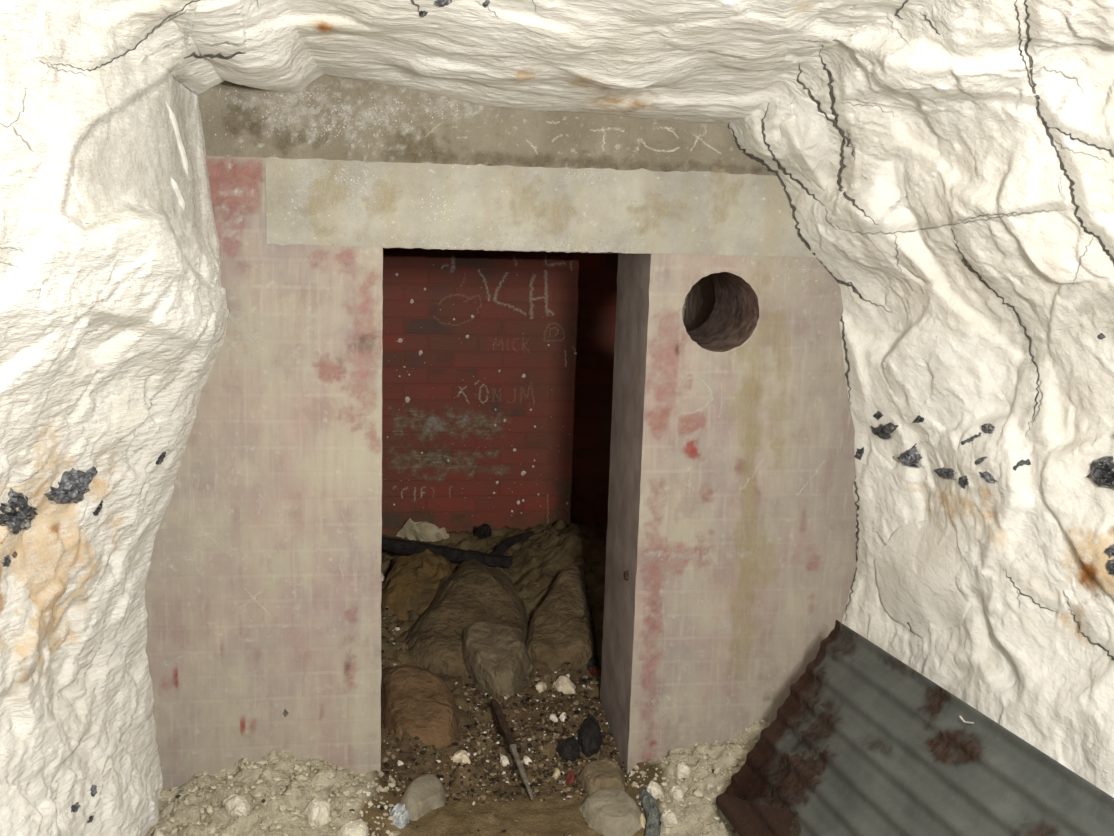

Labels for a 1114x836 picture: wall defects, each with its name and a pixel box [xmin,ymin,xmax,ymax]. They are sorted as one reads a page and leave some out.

crack [0,93,35,152]
crack [41,0,202,77]
crack [184,42,246,60]
crack [728,0,1114,433]
rust [0,488,95,664]
crack [845,476,887,621]